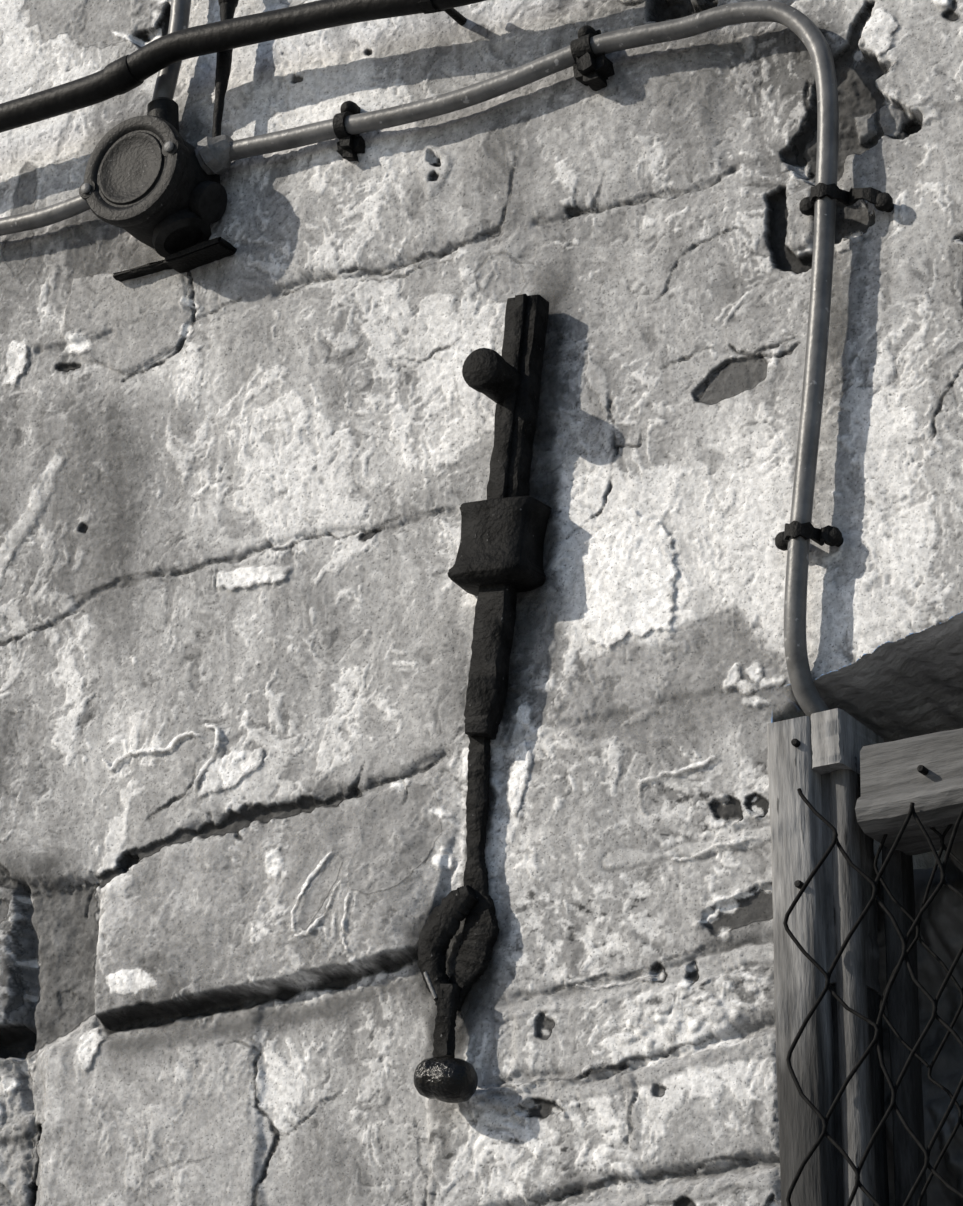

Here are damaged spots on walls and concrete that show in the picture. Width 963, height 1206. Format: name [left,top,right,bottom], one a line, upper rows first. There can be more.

spalling [618,0,718,22]
spalling [834,1,939,181]
spalling [766,80,817,274]
spalling [834,200,875,252]
spalling [692,344,798,405]
crack [933,367,963,437]
crack [0,508,452,645]
crack [96,757,442,888]
spalling [0,863,103,1206]
crack [95,952,418,1206]
crack [31,1123,42,1206]
spalling [674,1197,695,1206]